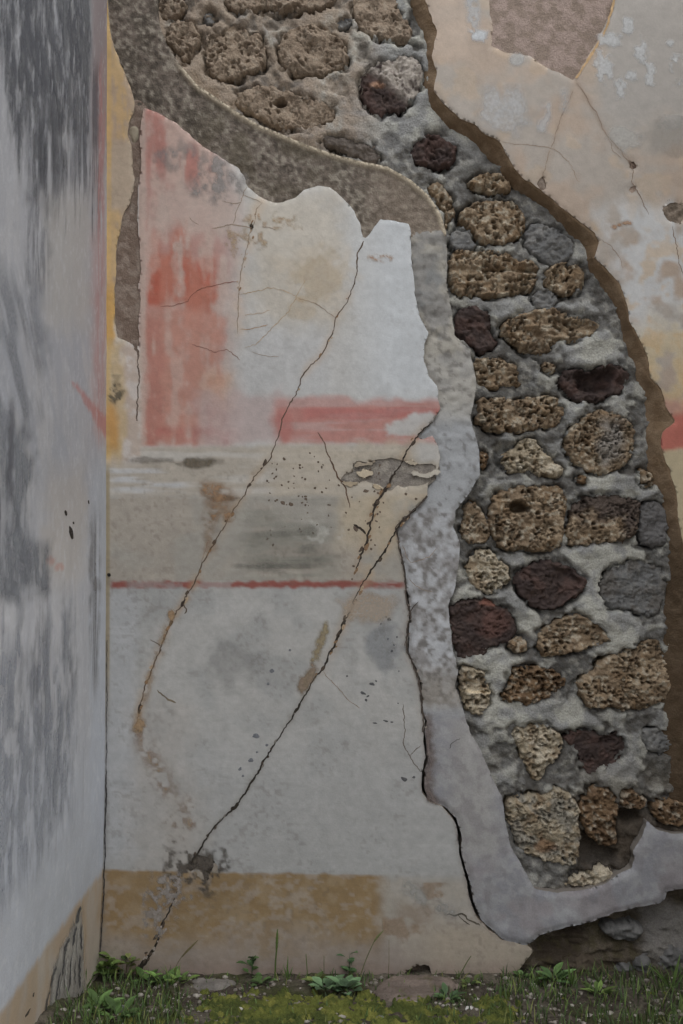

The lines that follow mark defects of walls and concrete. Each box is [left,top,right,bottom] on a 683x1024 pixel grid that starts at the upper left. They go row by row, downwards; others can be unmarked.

flaking render [115,100,148,346]
crack [504,85,649,215]
crack [137,187,364,719]
spalling [158,0,683,890]
crack [188,422,437,864]
crack [137,891,177,969]
water stain [143,849,230,935]